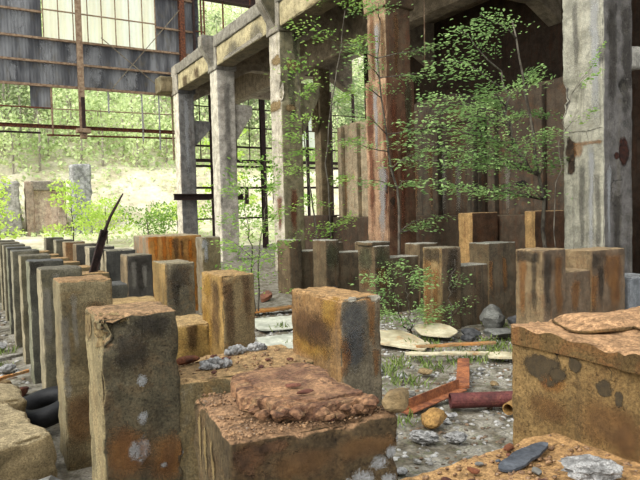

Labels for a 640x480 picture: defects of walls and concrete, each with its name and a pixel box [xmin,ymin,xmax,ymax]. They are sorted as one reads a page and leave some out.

water stain [608,4,631,102]
rust [382,92,405,216]
water stain [607,167,620,248]
rust [154,237,172,260]
water stain [129,441,149,461]